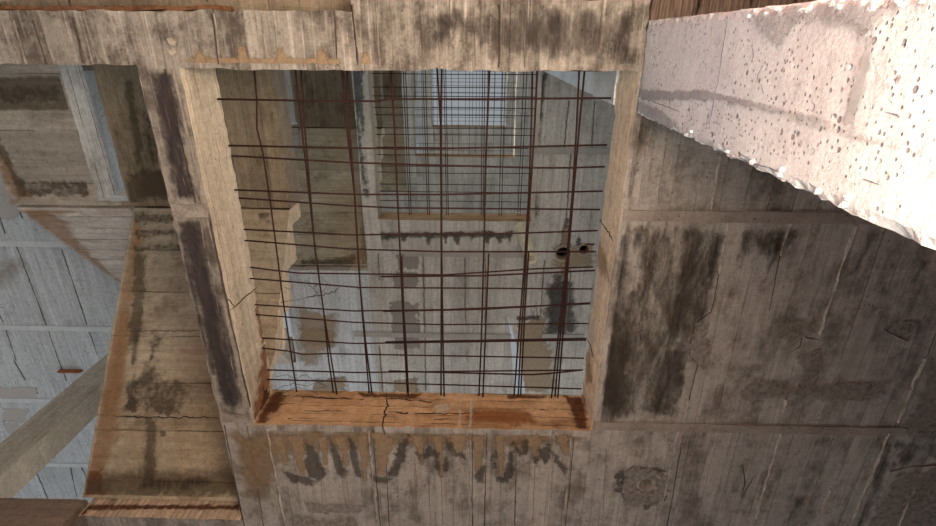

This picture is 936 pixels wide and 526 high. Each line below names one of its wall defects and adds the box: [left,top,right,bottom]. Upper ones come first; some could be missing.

leakage [439,9,630,56]
rust [29,210,119,281]
leakage [125,74,240,407]
rust [81,317,239,515]
leakage [87,339,235,496]
rust [255,291,286,423]
crack [281,395,364,419]
rust [231,395,588,496]
crack [382,397,469,433]
spalling [614,466,670,510]
leakage [601,228,718,420]
spalling [869,465,936,526]